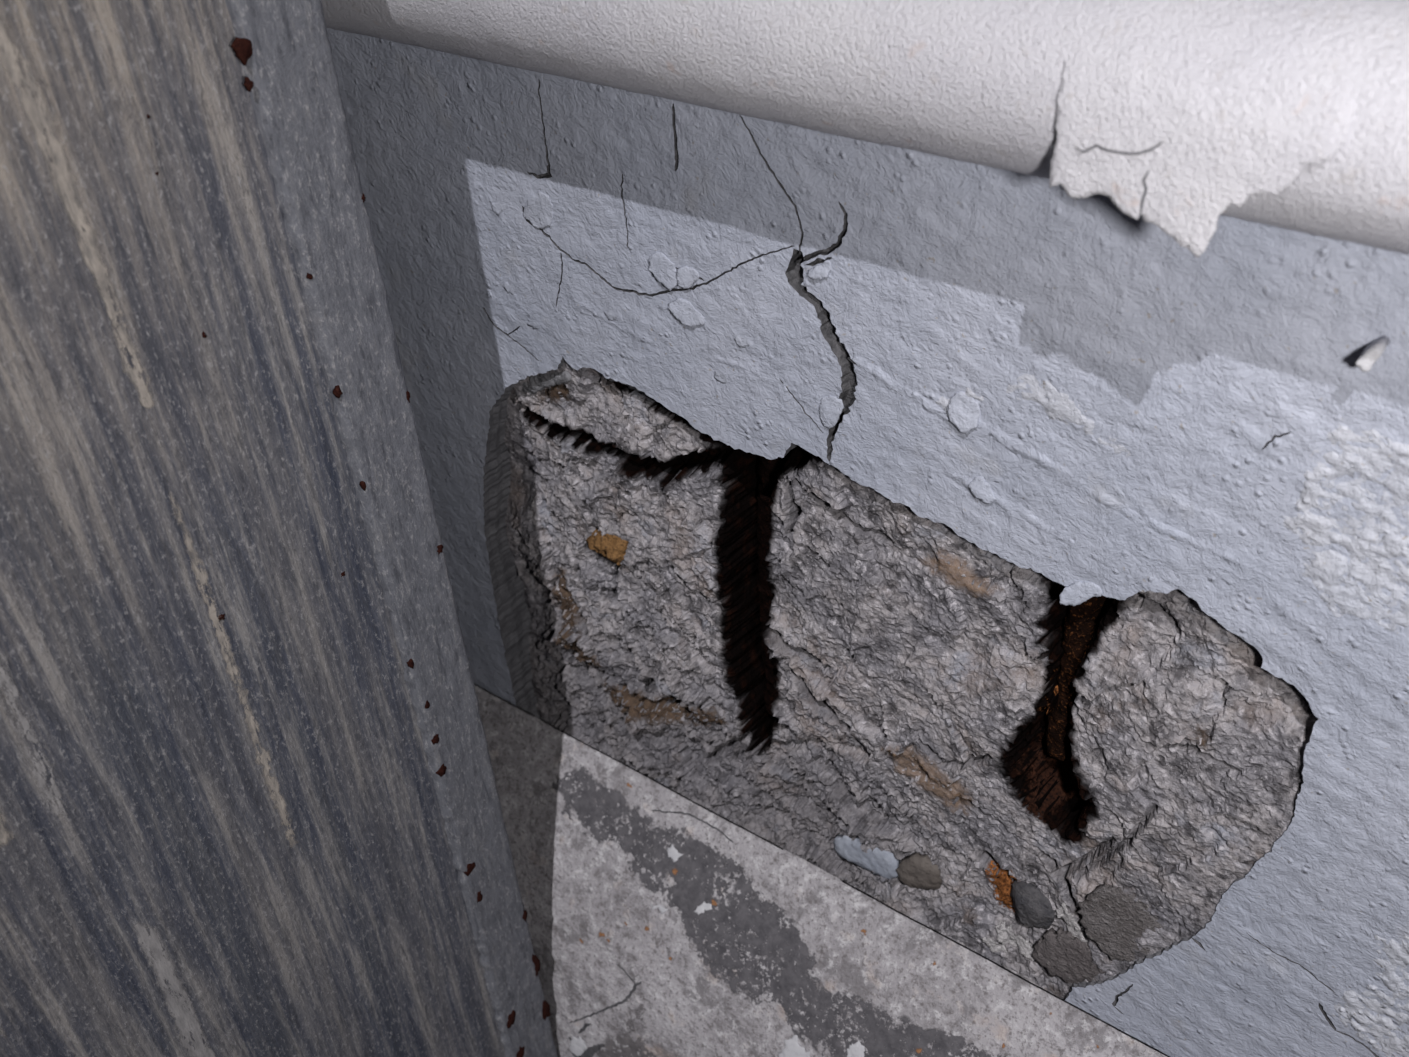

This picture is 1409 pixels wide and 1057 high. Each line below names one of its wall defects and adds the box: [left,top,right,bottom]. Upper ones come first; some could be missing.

peeling [1049,31,1357,258]
crack [522,79,902,461]
peeling [1355,336,1390,372]
spalling [483,356,1318,1000]
corrosion [1017,669,1092,822]